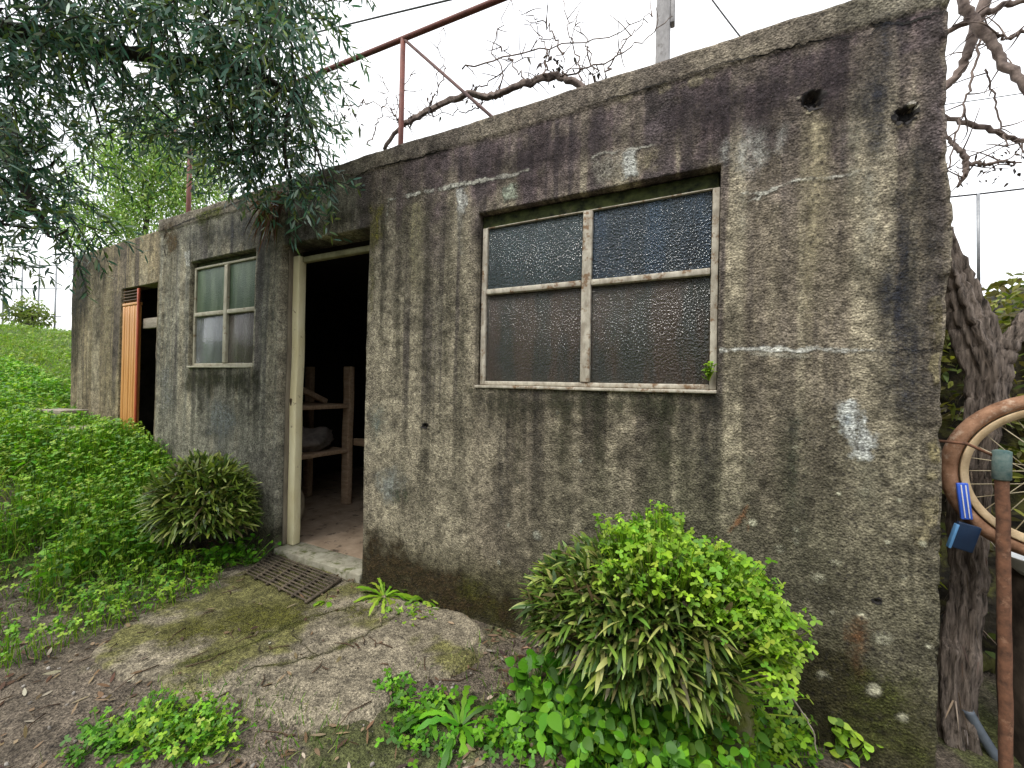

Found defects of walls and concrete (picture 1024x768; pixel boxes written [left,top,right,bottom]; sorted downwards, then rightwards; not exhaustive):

spalling [796,89,829,114]
spalling [891,101,922,128]
damp [502,184,517,201]
damp [719,346,872,357]
damp [837,399,877,461]